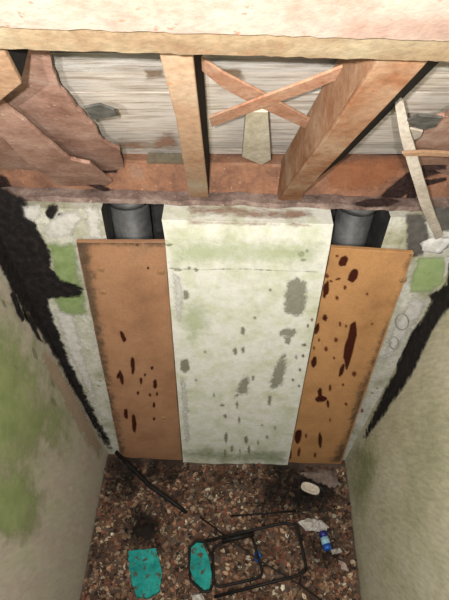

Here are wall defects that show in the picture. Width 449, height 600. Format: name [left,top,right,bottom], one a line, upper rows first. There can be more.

leakage [323,255,358,298]
leakage [284,278,306,316]
leakage [0,188,112,449]
leakage [236,376,254,406]
leakage [271,355,286,389]
leakage [280,329,295,345]
leakage [315,385,331,407]
leakage [339,322,357,377]
leakage [363,270,449,438]
leakage [289,430,307,459]